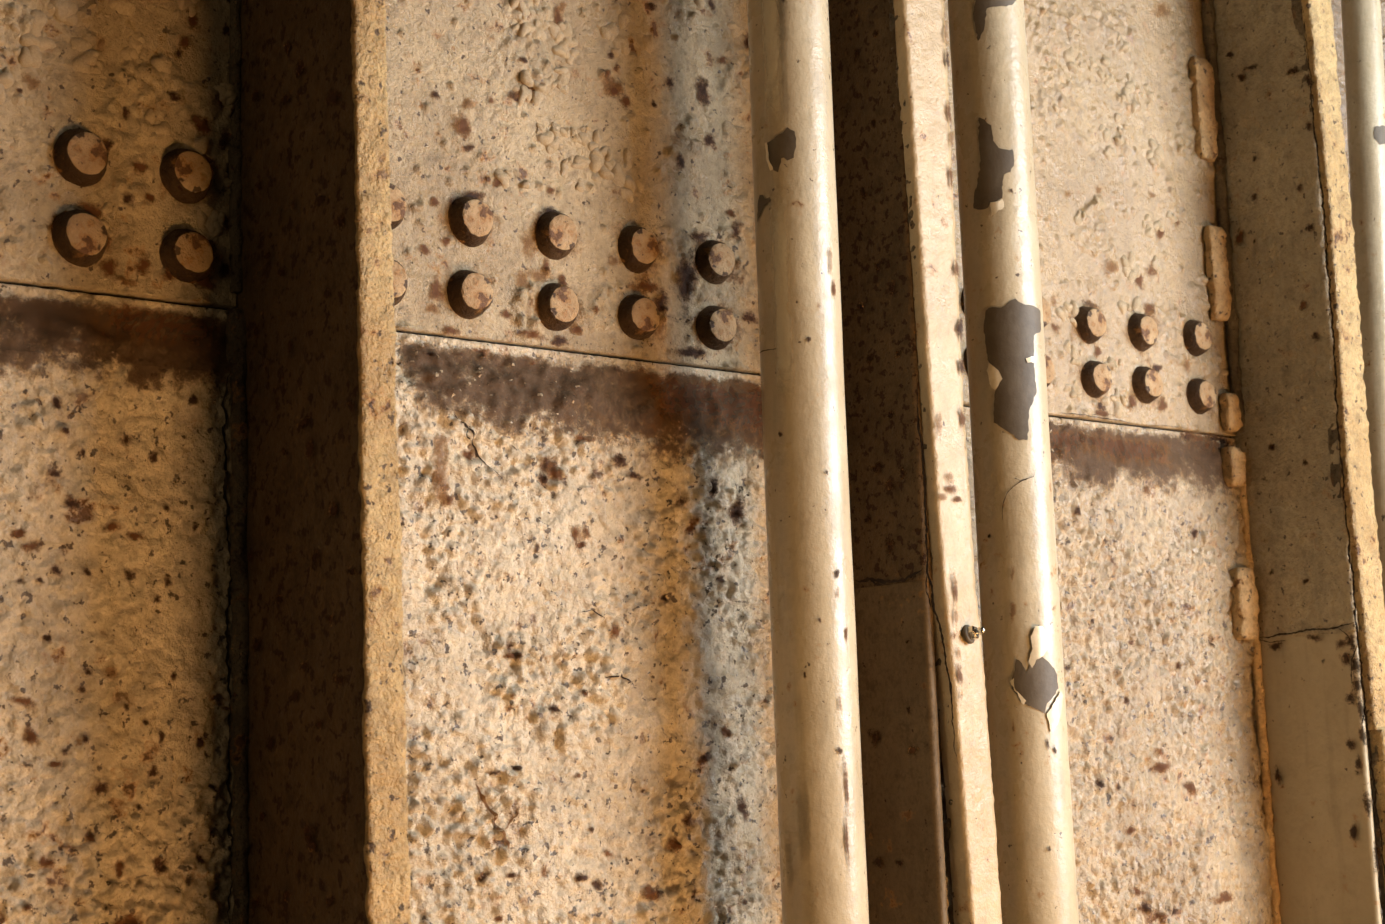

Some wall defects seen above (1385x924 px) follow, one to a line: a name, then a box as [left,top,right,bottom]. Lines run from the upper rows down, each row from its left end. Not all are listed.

rust [174,7,198,58]
peeling [973,0,1016,41]
rust [78,202,102,219]
rust [124,193,155,203]
rust [191,92,235,174]
rust [430,179,502,206]
rust [518,187,567,310]
peeling [765,127,796,172]
peeling [973,118,1014,216]
peeling [984,298,1041,440]
crack [221,373,233,923]
peeling [1010,626,1063,732]